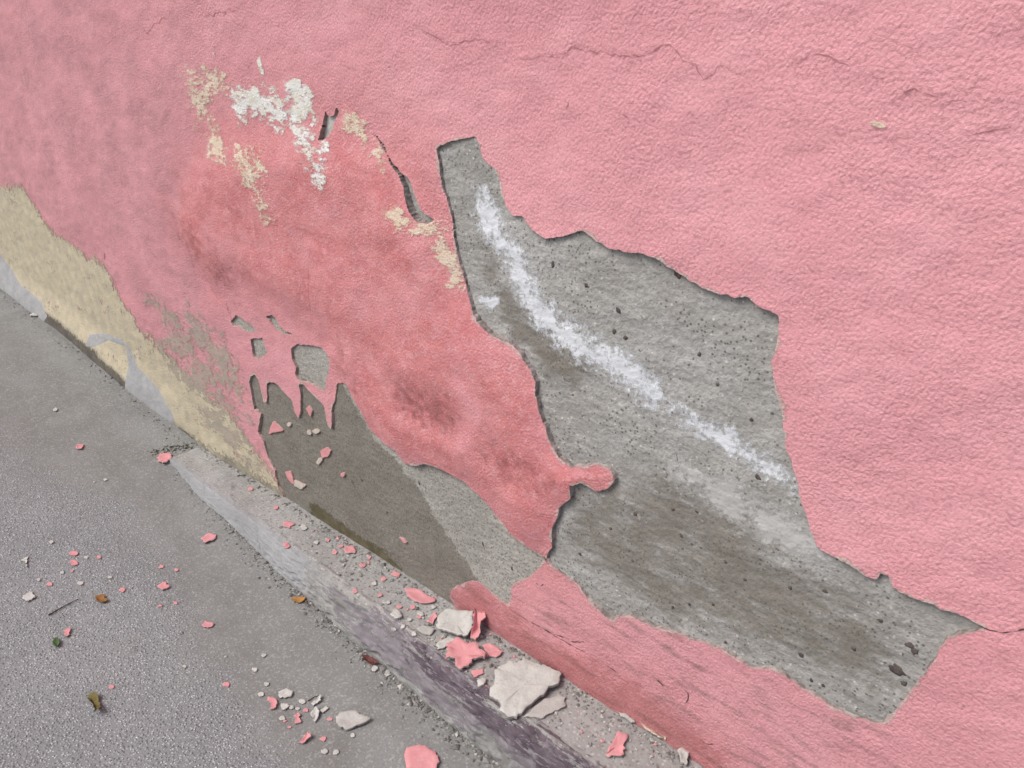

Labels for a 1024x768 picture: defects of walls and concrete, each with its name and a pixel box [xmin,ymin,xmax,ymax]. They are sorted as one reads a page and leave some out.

peeling [185,52,386,226]
crack [374,134,434,224]
crack [414,24,762,80]
water stain [470,184,798,496]
spalling [0,136,986,768]
water stain [668,460,834,561]